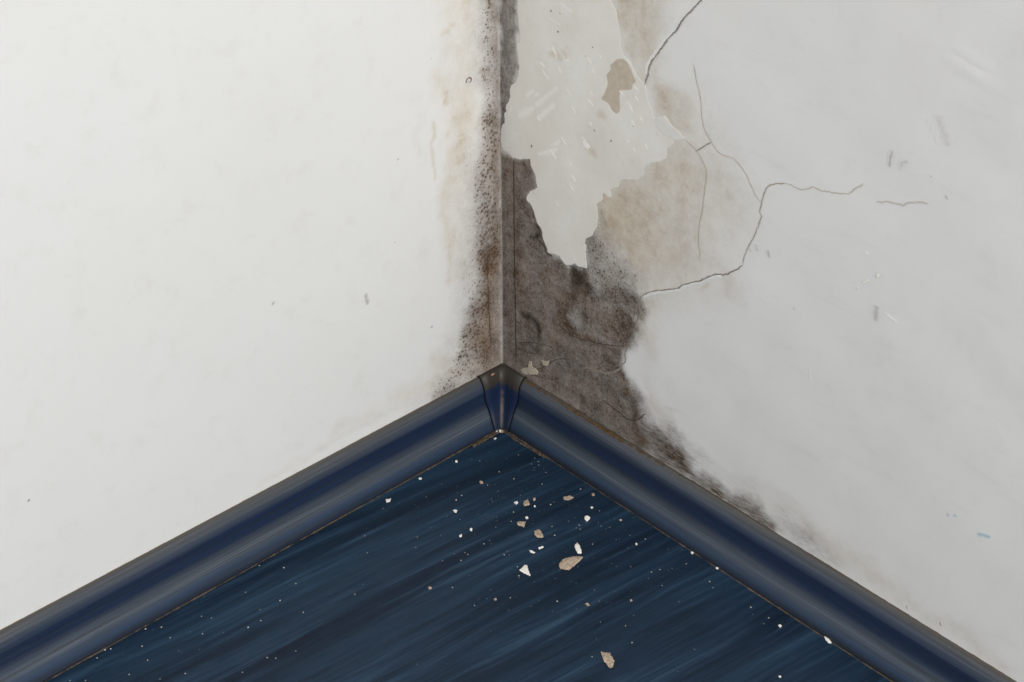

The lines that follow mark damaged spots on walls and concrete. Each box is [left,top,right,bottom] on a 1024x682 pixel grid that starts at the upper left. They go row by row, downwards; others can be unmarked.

peeling [501,0,684,268]
water stain [257,0,1023,677]
crack [645,0,702,83]
crack [487,68,928,421]